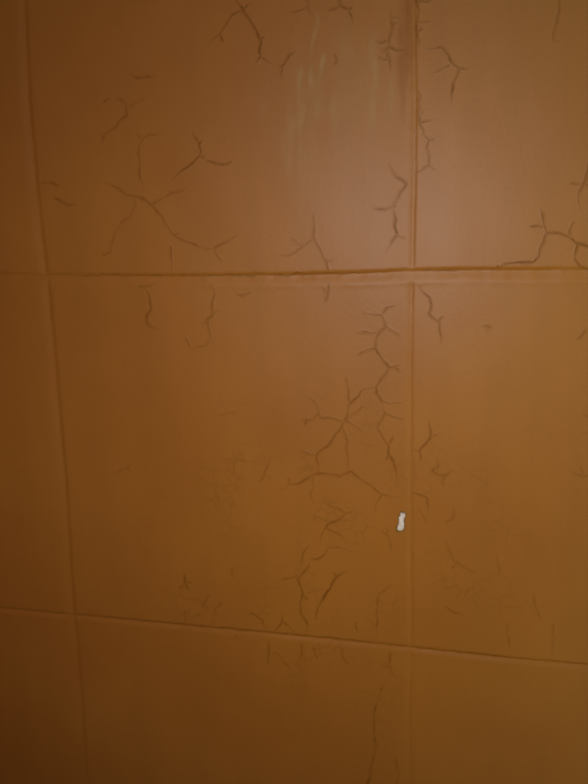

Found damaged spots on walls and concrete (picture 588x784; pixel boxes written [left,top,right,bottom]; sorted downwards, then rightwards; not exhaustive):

crack [209,0,296,79]
crack [413,0,468,104]
crack [51,87,588,345]
peeling [396,511,407,532]